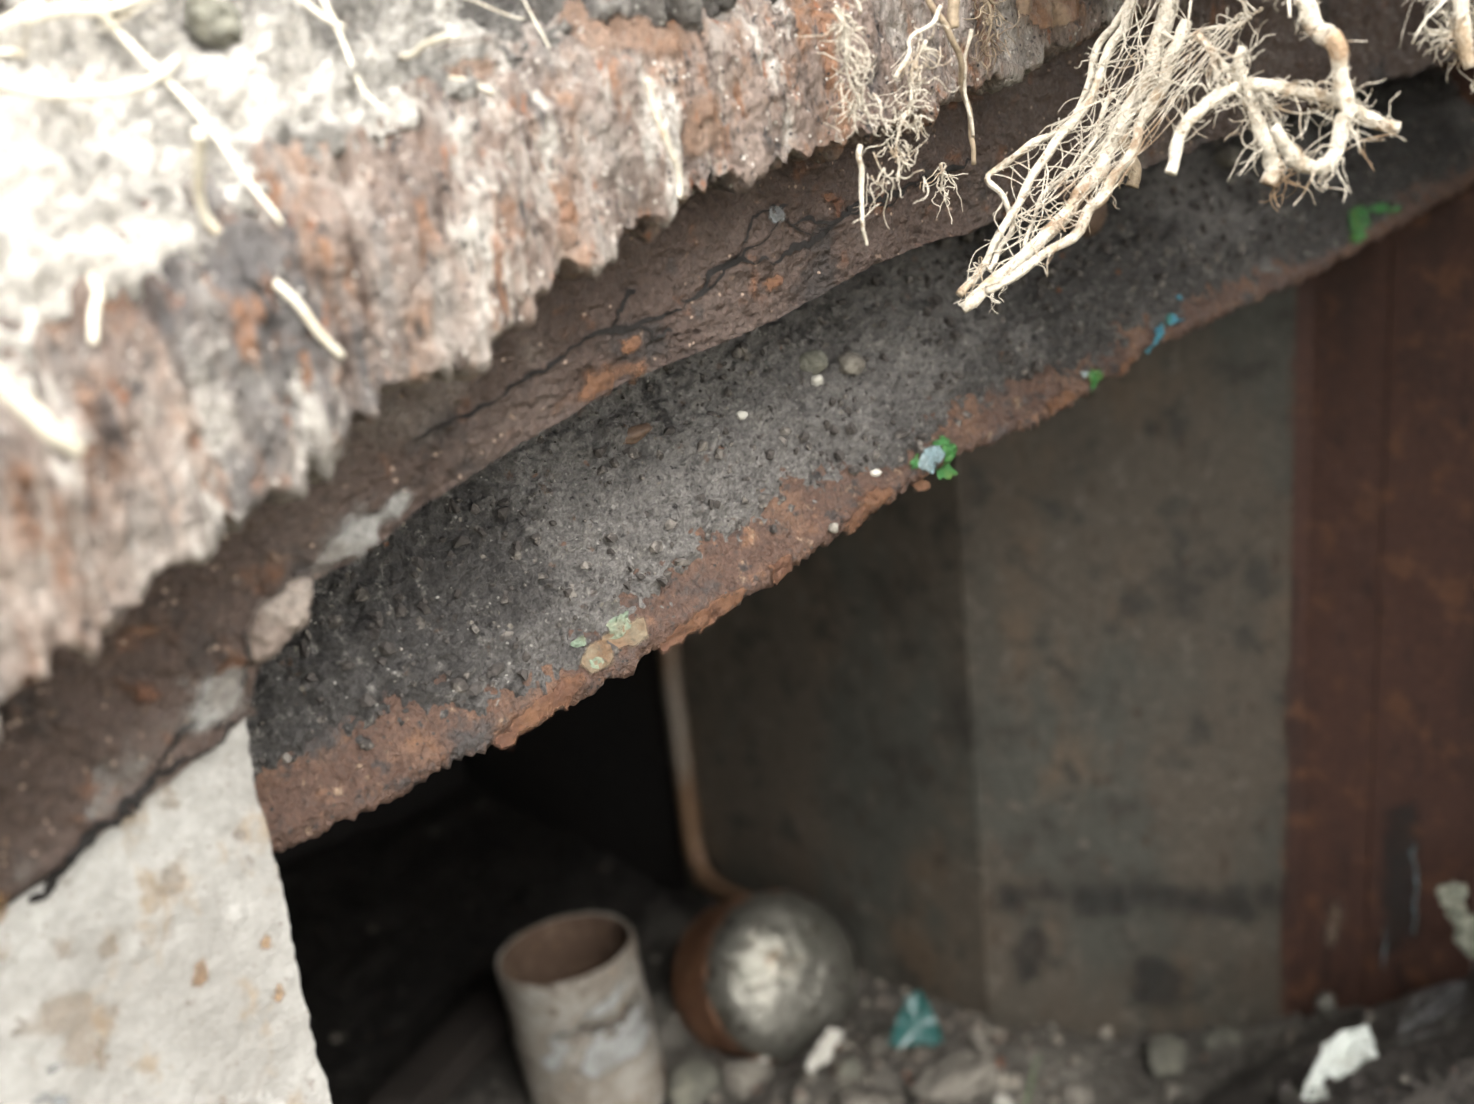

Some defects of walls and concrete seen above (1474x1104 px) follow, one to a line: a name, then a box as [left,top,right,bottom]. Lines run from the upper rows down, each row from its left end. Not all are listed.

rust [769,206,785,223]
crack [402,158,977,450]
rust [763,273,784,293]
rust [579,335,646,402]
peeling [910,435,957,491]
spalling [318,489,411,565]
rust [843,486,894,534]
rust [768,554,793,585]
peeling [570,611,648,673]
rust [658,587,748,652]
spalling [191,668,242,730]
rust [494,674,586,749]